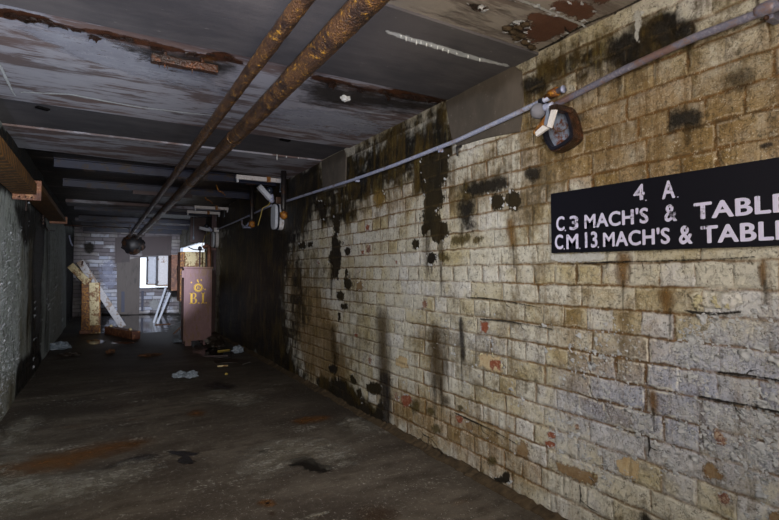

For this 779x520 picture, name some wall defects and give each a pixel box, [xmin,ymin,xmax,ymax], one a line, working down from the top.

peeling [502,0,609,51]
damp [451,176,508,245]
damp [329,313,390,432]
peeling [545,304,779,520]